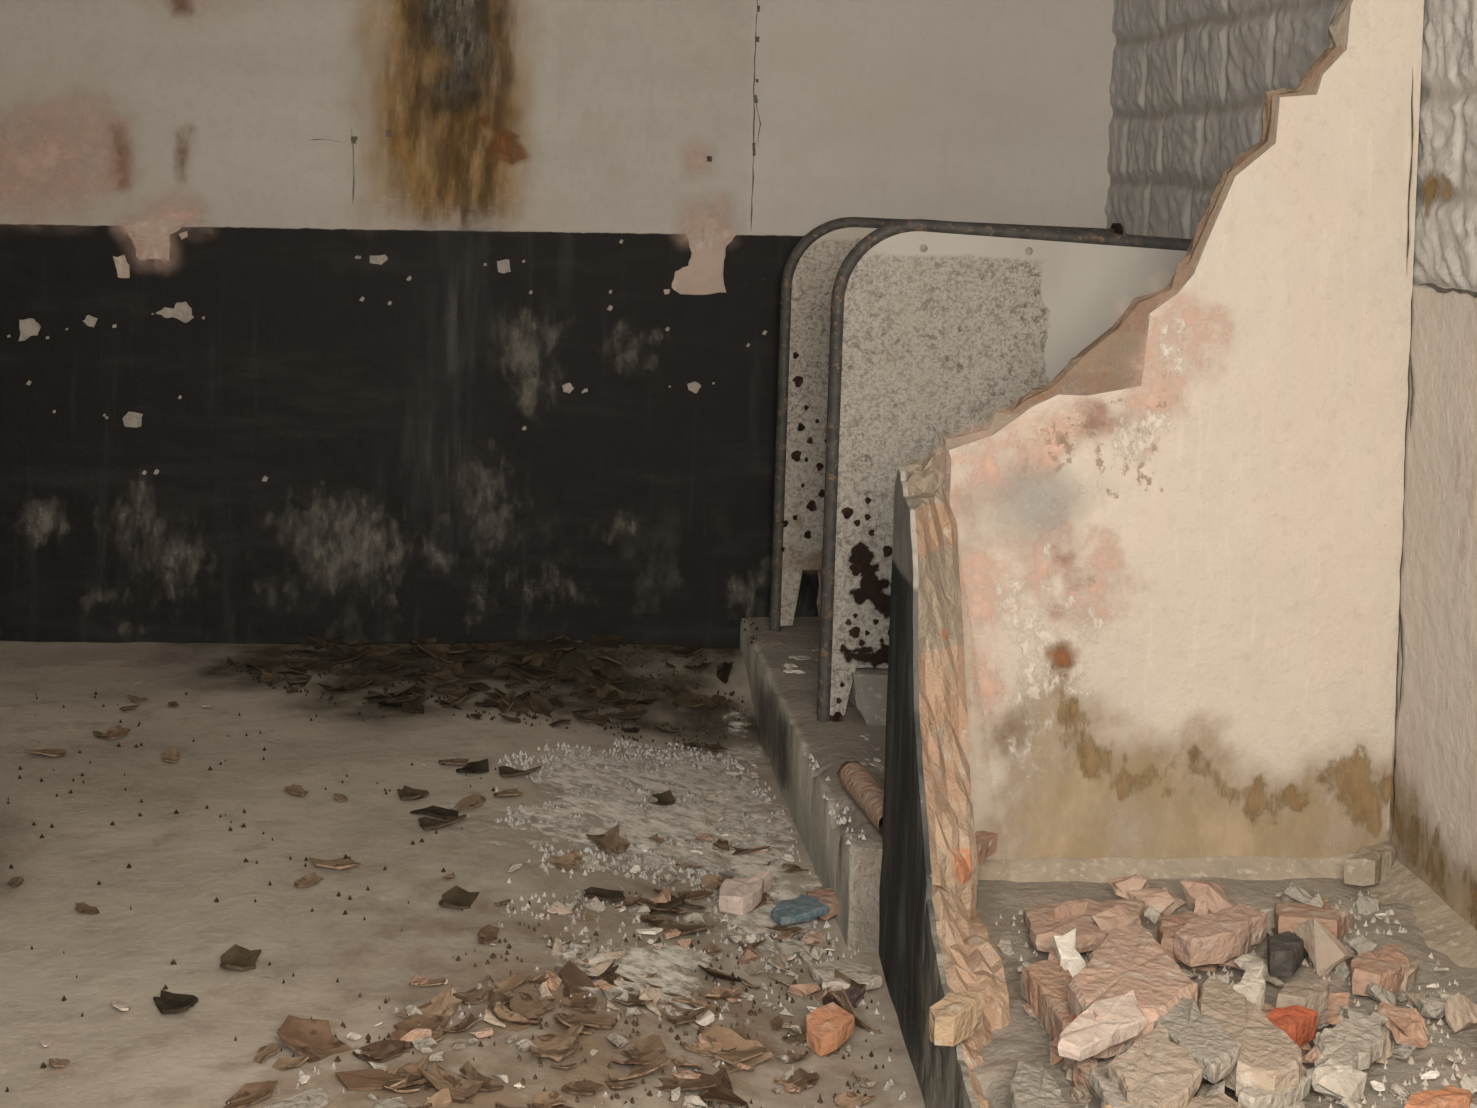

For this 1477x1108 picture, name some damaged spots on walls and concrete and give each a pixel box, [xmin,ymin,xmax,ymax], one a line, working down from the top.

rust [382,0,525,219]
peeling [113,203,201,278]
peeling [664,203,737,295]
peeling [7,315,117,341]
peeling [152,302,205,323]
rust [423,246,473,508]
damp [21,502,66,545]
damp [118,480,200,593]
damp [266,498,404,602]
rust [840,497,892,668]
rust [831,682,845,722]
damp [994,680,1477,930]